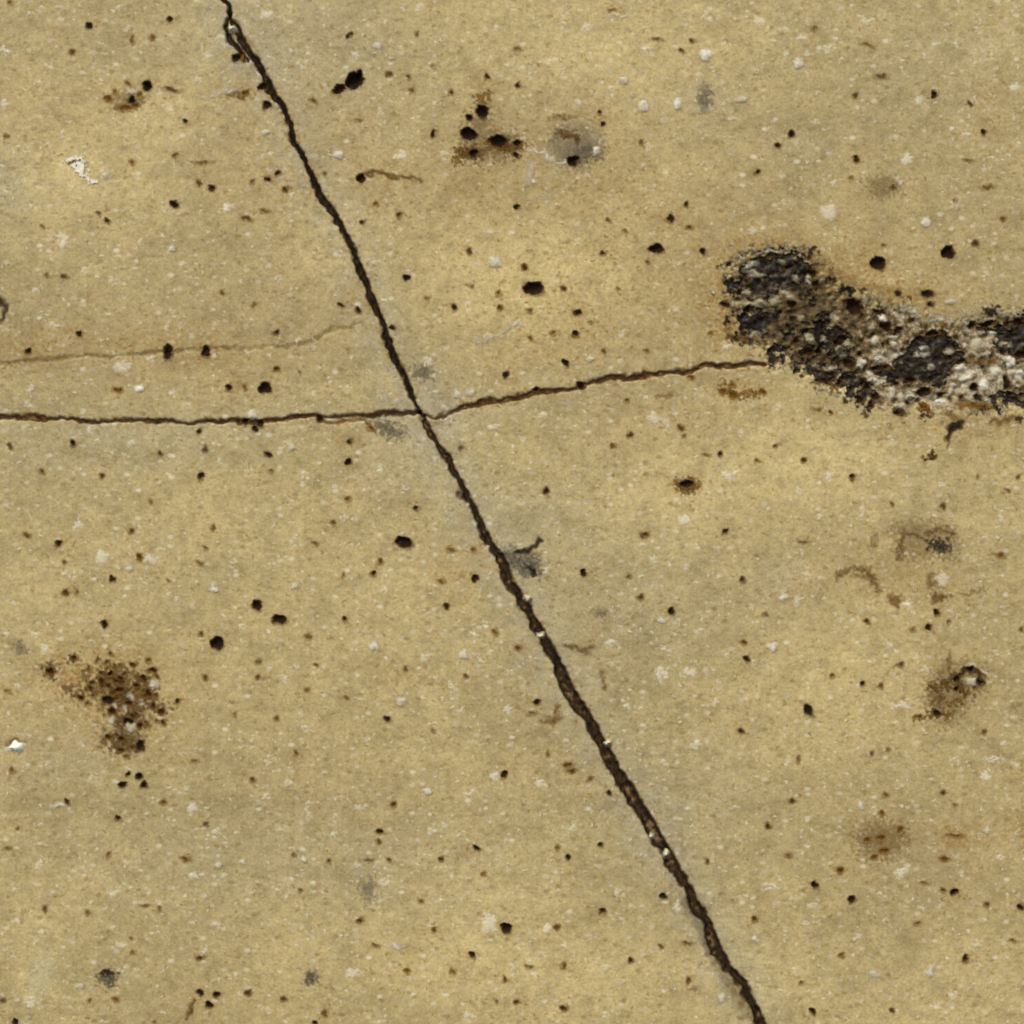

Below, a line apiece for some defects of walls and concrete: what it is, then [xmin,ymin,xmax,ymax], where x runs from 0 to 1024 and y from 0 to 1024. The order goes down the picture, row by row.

spalling [711,233,1024,426]
crack [0,0,766,1024]
corrosion [913,666,985,722]